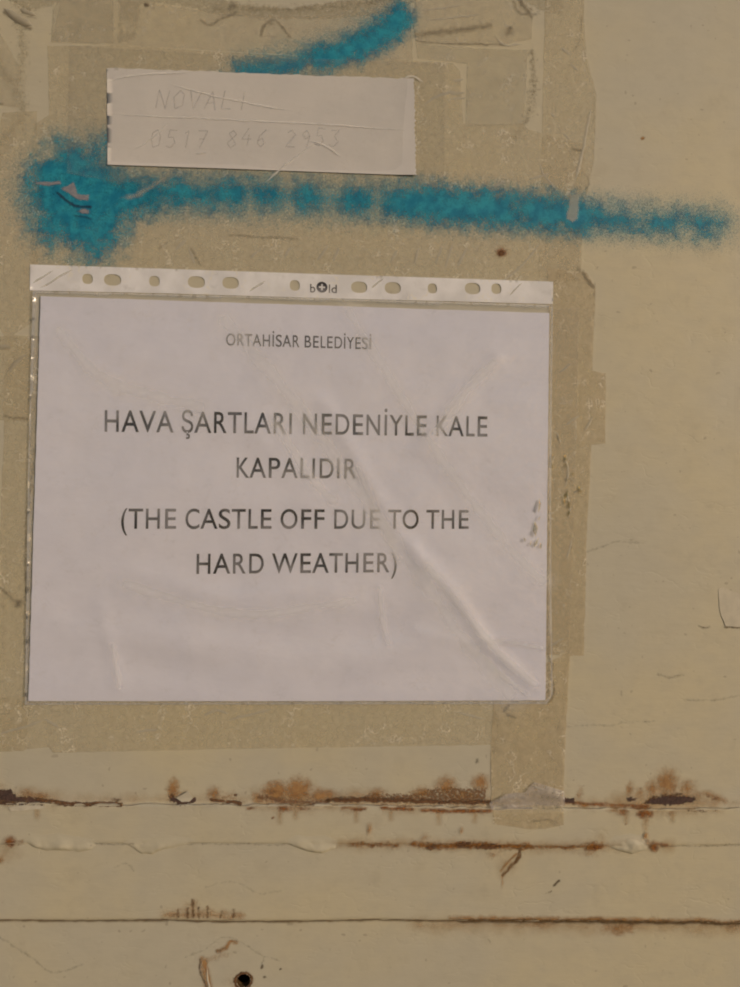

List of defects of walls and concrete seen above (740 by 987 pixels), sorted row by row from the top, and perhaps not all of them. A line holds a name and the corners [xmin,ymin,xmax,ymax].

corrosion [210,777,491,819]
corrosion [563,774,690,825]
corrosion [411,830,604,876]